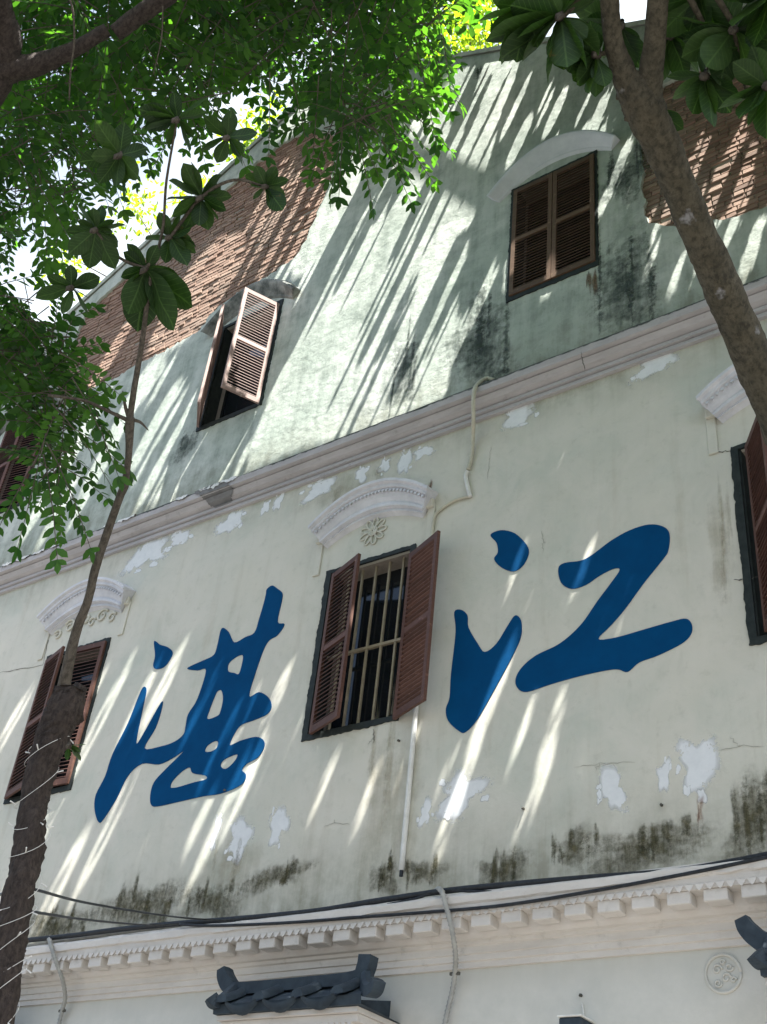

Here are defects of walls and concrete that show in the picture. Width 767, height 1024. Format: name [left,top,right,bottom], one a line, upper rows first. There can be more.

water stain [598,239,655,320]
water stain [447,294,508,383]
peeling [630,353,679,382]
peeling [355,446,435,483]
peeling [121,530,193,574]
peeling [210,813,254,864]
peeling [416,770,490,827]
water stain [552,816,700,873]
peeling [656,738,719,803]
water stain [732,779,767,855]
water stain [98,877,172,924]
water stain [252,860,308,893]